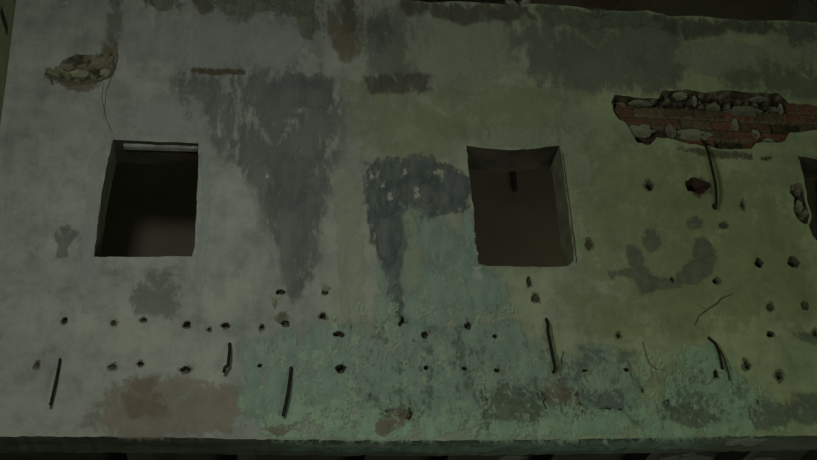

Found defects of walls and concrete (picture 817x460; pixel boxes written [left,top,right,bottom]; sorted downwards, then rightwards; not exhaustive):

spalling [44,36,118,118]
leakage [365,0,817,94]
leakage [177,67,342,297]
spalling [611,89,817,210]
spalling [790,183,810,224]
leakage [239,178,817,453]